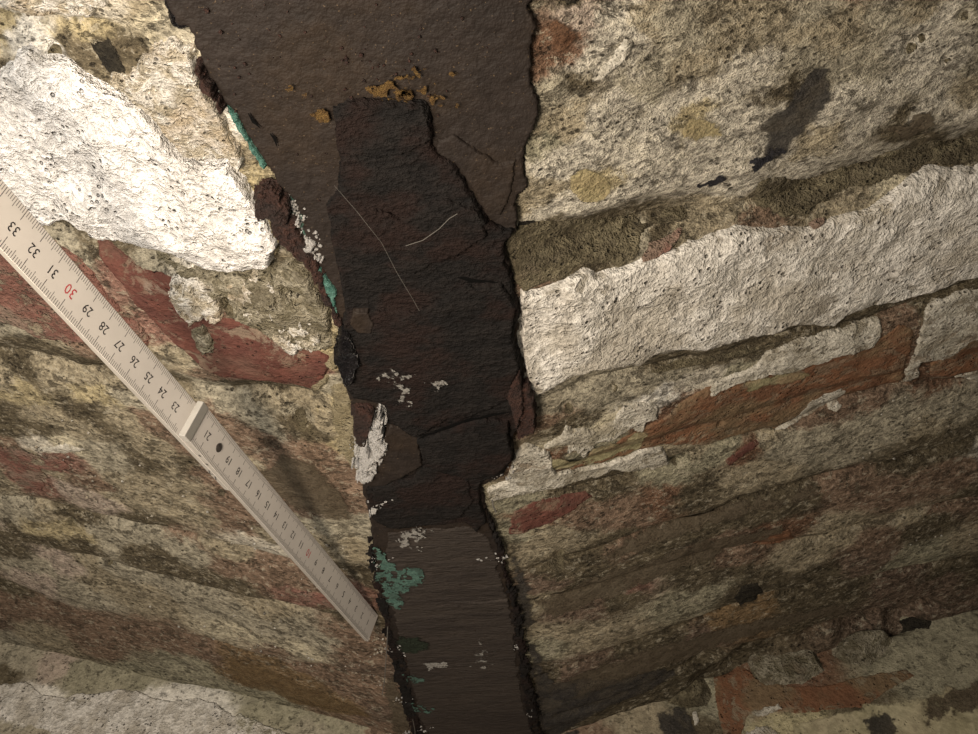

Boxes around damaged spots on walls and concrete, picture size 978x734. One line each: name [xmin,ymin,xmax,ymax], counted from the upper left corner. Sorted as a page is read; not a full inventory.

peeling [332,133,516,275]
spalling [752,136,978,229]
spalling [294,408,315,435]
damp [351,403,388,484]
damp [376,368,412,407]
peeling [342,205,688,519]
flaking render [570,325,913,470]
flaking render [929,340,978,376]
flaking render [509,491,592,534]